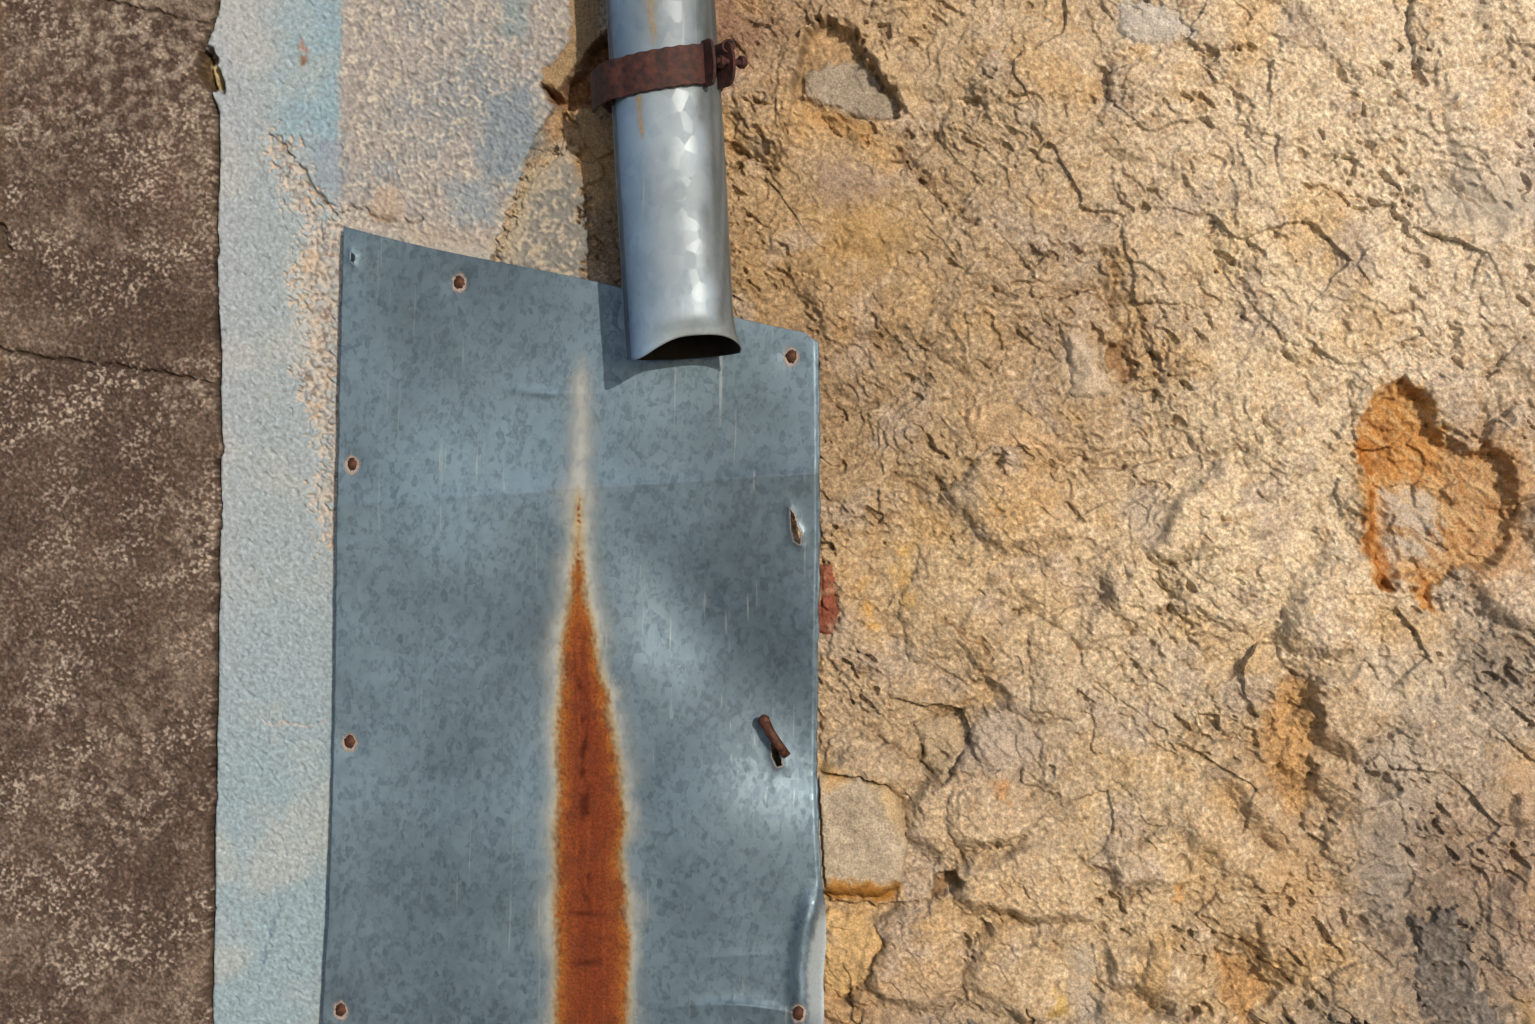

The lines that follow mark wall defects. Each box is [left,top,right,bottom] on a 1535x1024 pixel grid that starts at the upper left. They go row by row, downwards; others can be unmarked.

flaking render [1118,0,1194,48]
flaking render [798,56,902,122]
flaking render [1066,334,1112,401]
flaking render [960,399,1075,468]
crack [0,0,328,1024]
corrosion [1359,448,1392,591]
flaking render [1378,486,1443,569]
corrosion [543,370,639,1024]
flaking render [915,711,1043,784]
spalling [1251,672,1328,828]
flaking render [817,769,909,1024]